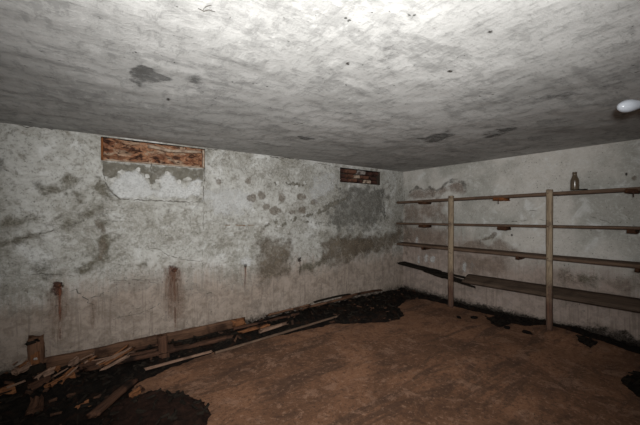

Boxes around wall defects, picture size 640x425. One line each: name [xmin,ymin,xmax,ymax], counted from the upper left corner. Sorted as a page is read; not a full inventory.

peeling [102,161,204,186]
water stain [300,186,446,270]
water stain [257,237,291,282]